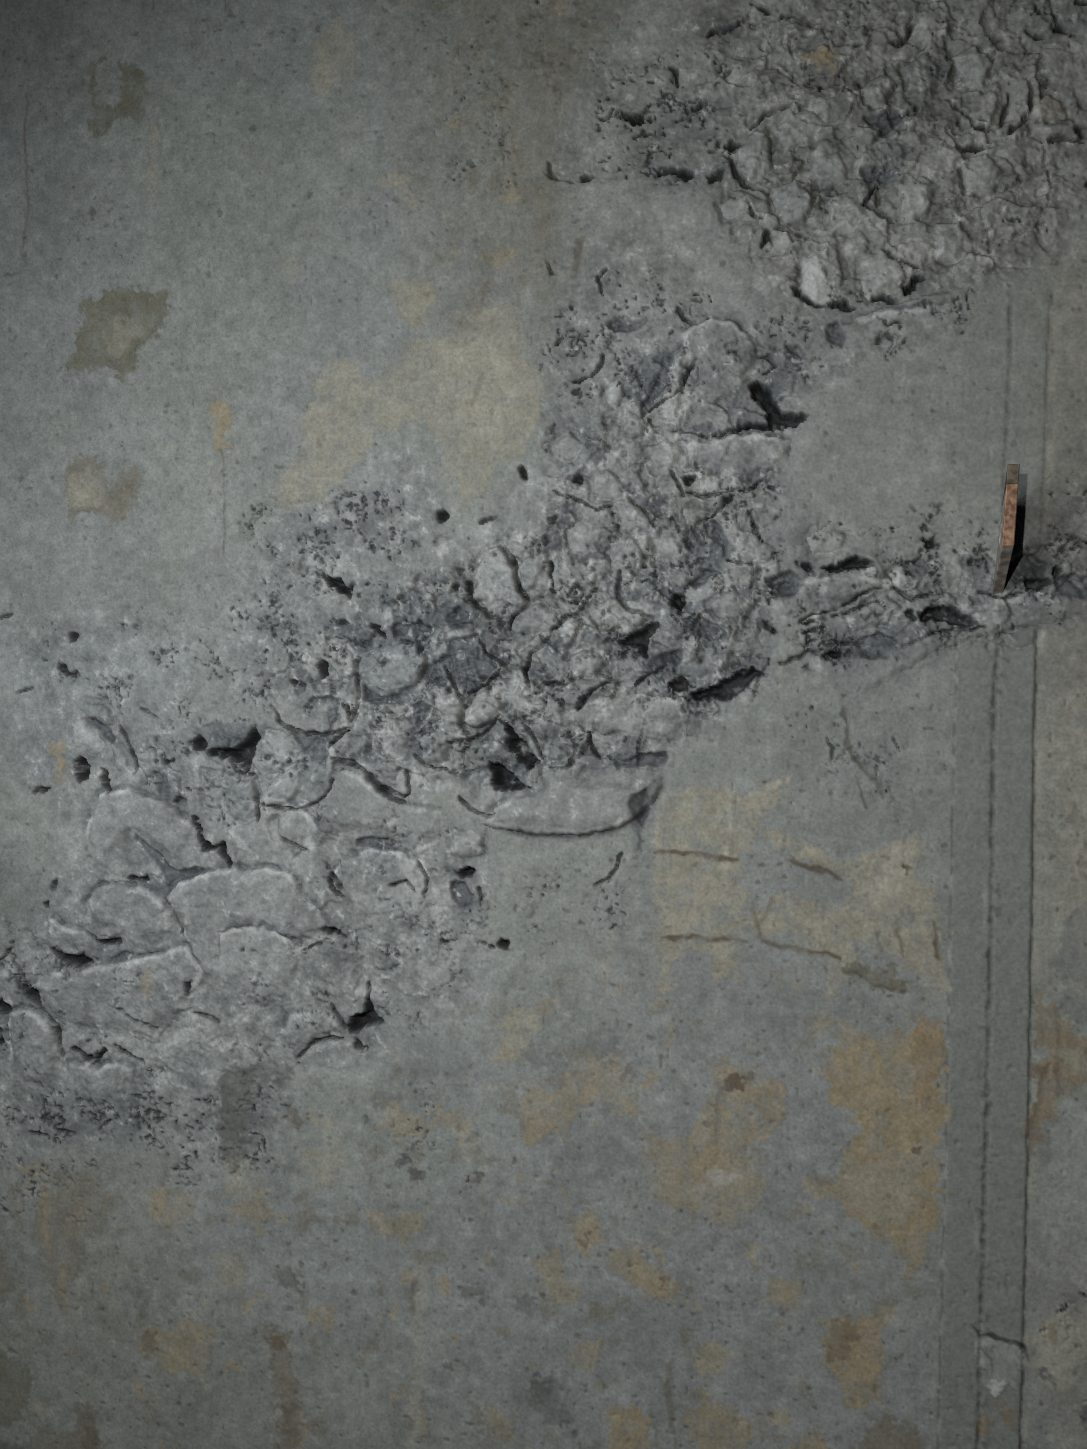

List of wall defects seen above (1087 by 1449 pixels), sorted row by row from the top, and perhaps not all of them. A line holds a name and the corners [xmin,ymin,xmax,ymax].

peeling [83,50,152,140]
peeling [63,454,144,530]
crack [590,747,741,889]
crack [659,856,846,963]
spalling [397,1150,428,1184]